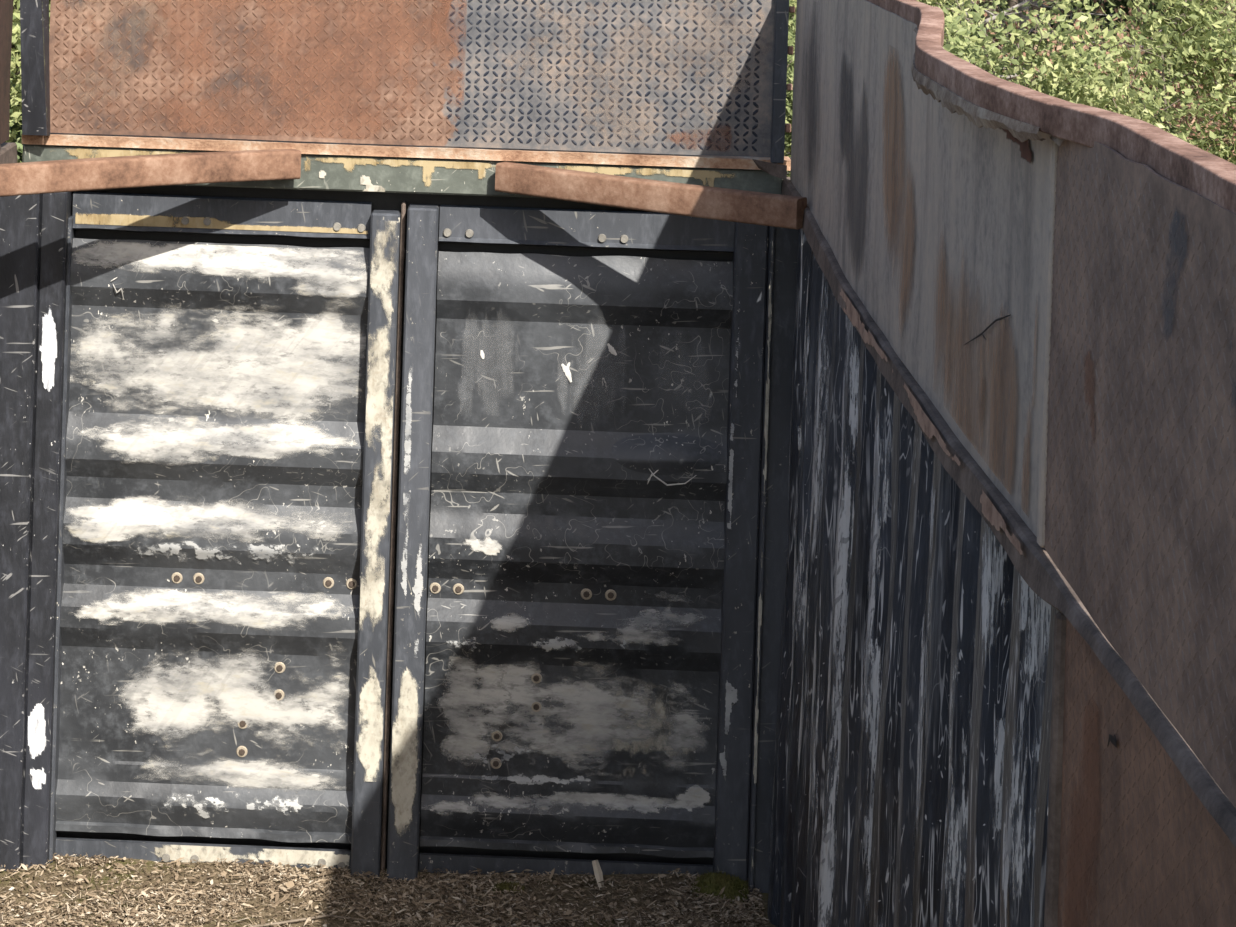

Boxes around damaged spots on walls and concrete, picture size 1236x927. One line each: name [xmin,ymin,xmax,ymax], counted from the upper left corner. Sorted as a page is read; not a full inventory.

peeling [360,175,385,192]
rust [559,166,734,187]
rust [999,128,1032,163]
rust [840,289,893,372]
peeling [39,221,423,628]
peeling [763,286,772,493]
rust [903,383,961,466]
peeling [119,650,418,832]
peeling [430,597,710,814]
peeling [719,681,738,776]
peeling [753,594,762,783]